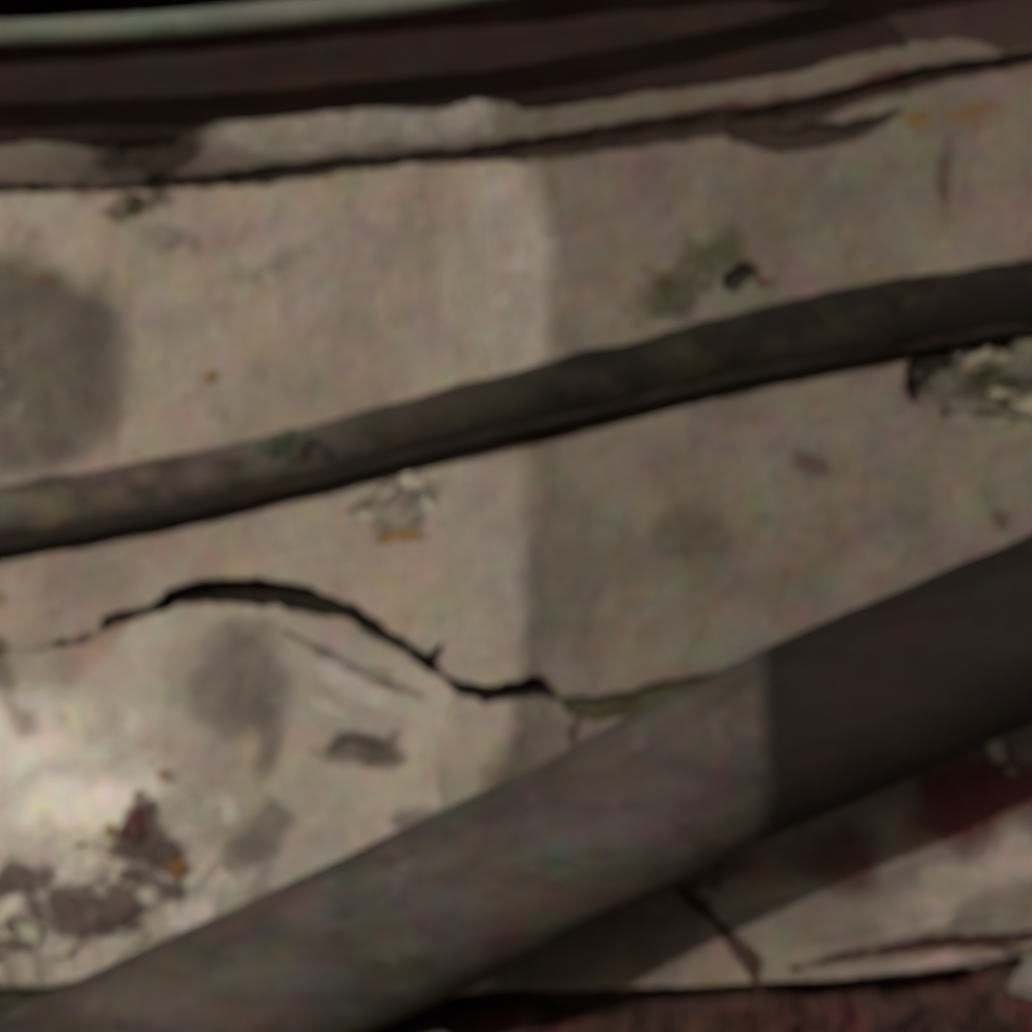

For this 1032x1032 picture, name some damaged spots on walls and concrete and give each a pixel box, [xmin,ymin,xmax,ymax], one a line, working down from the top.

damp [0,263,102,464]
spalling [951,337,1032,417]
spalling [324,704,396,766]
crack [100,578,714,746]
peeling [0,791,184,973]